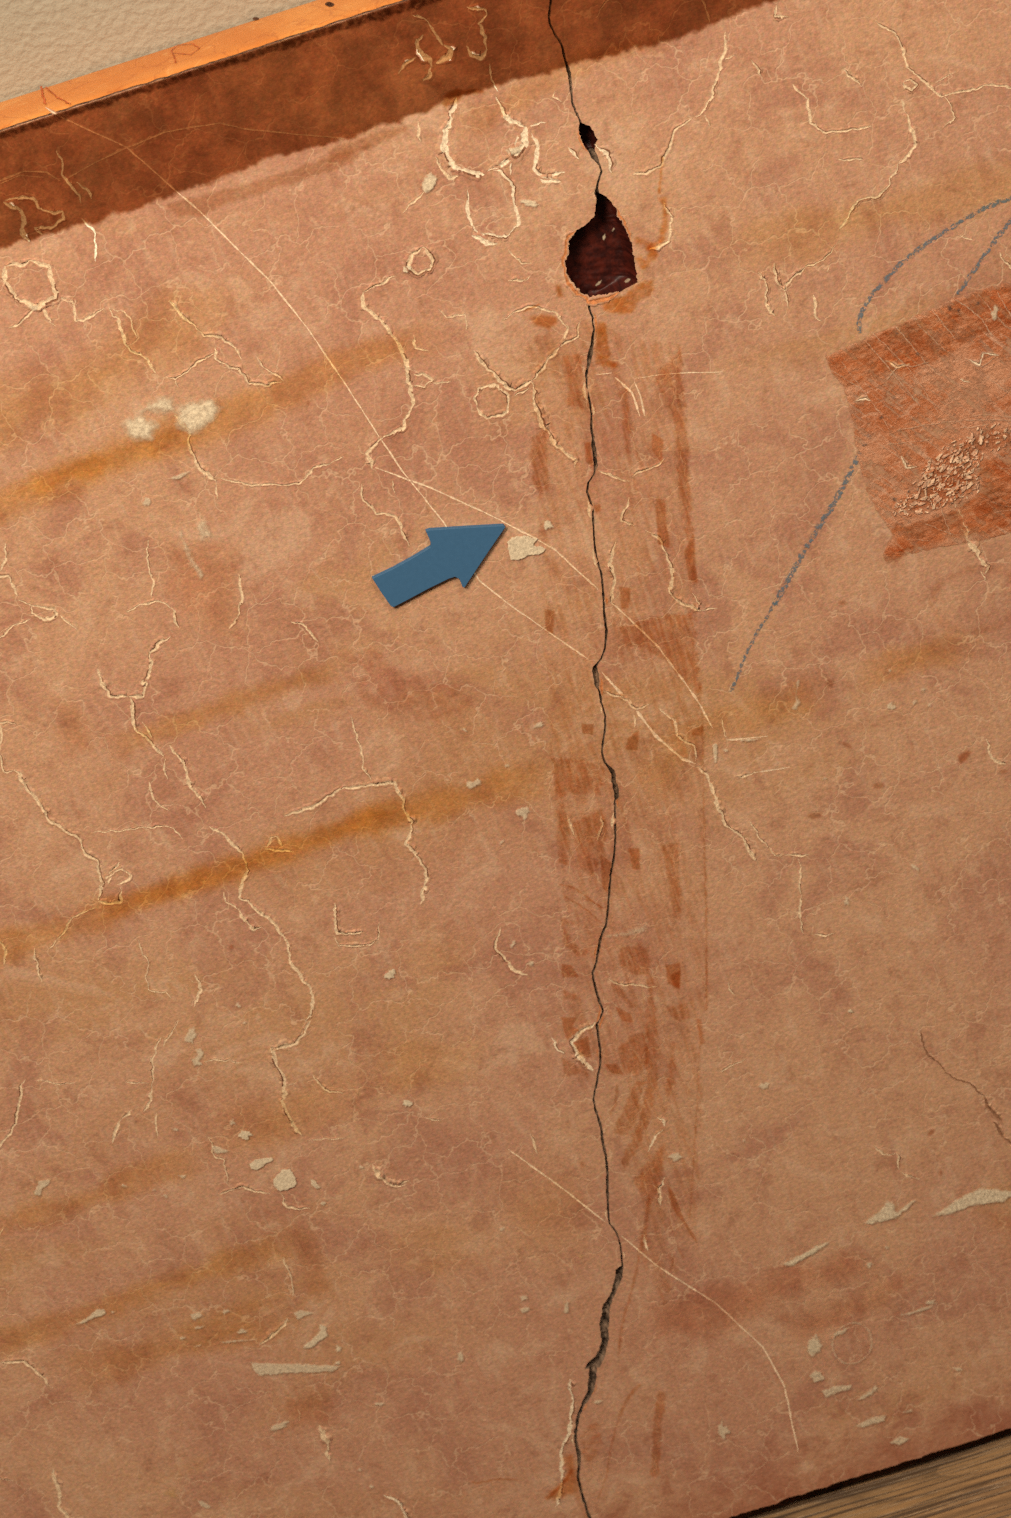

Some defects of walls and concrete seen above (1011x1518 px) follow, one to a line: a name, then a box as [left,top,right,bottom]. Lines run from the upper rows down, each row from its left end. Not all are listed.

crack [508,249,531,284]
crack [551,306,834,1518]